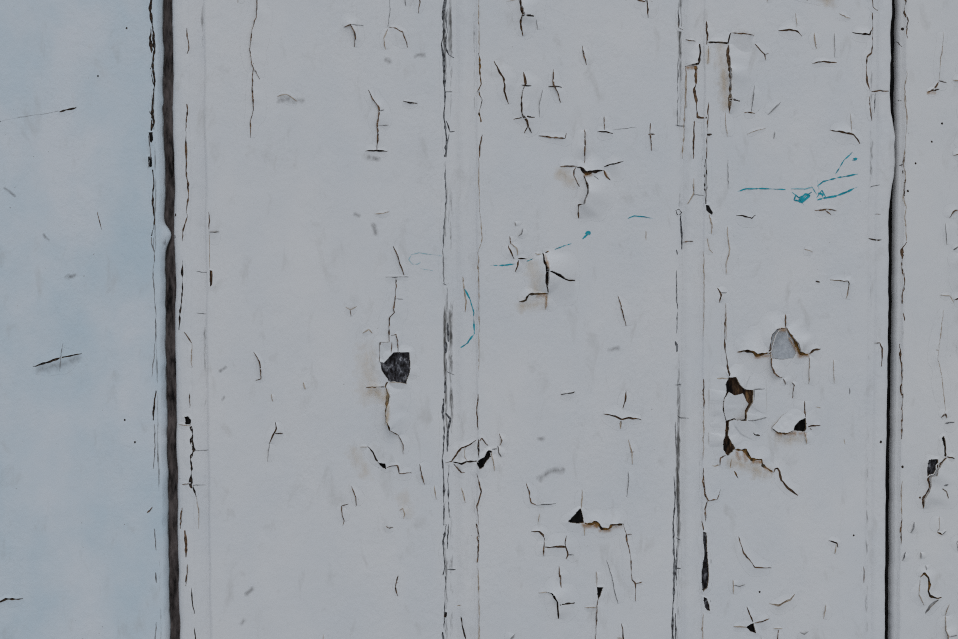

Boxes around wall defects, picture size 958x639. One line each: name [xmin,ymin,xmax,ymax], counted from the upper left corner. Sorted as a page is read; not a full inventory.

crack [240,0,298,138]
peeling [513,69,549,137]
peeling [796,0,889,145]
peeling [559,127,626,222]
peeling [501,221,580,311]
peeling [360,344,433,485]
peeling [445,433,509,503]
peeling [709,310,843,499]
peeling [915,408,958,537]
peeling [522,482,643,639]
peeling [733,593,798,639]
peeling [899,551,958,639]